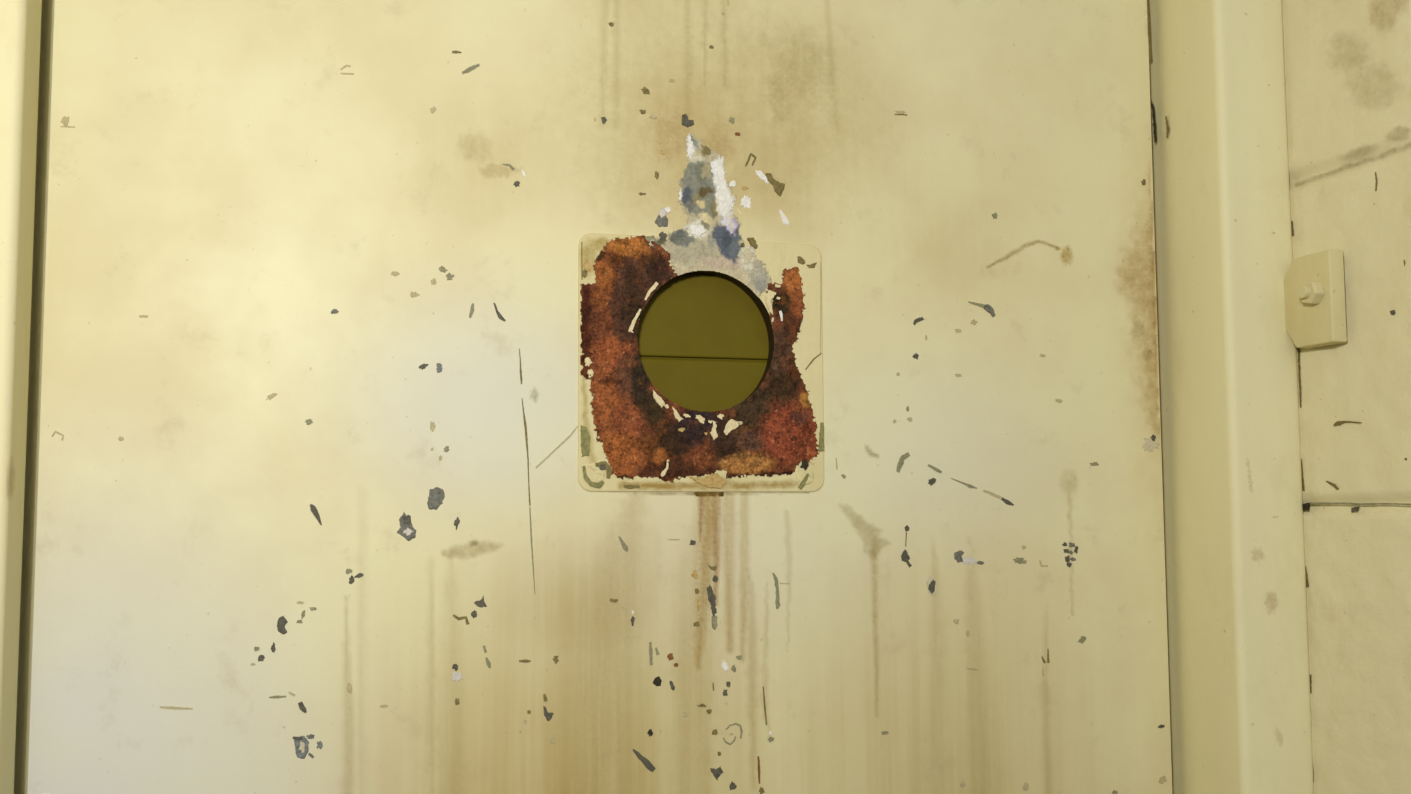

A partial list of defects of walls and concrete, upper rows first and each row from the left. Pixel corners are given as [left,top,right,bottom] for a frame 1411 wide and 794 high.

peeling [645,114,789,322]
corrosion [580,235,819,500]
peeling [897,452,910,473]
peeling [427,487,445,510]
peeling [310,504,322,525]
peeling [397,512,416,541]
peeling [901,525,912,568]
peeling [1062,542,1078,568]
peeling [453,596,487,625]
peeling [250,601,317,666]
peeling [269,691,307,713]
peeling [293,734,323,759]